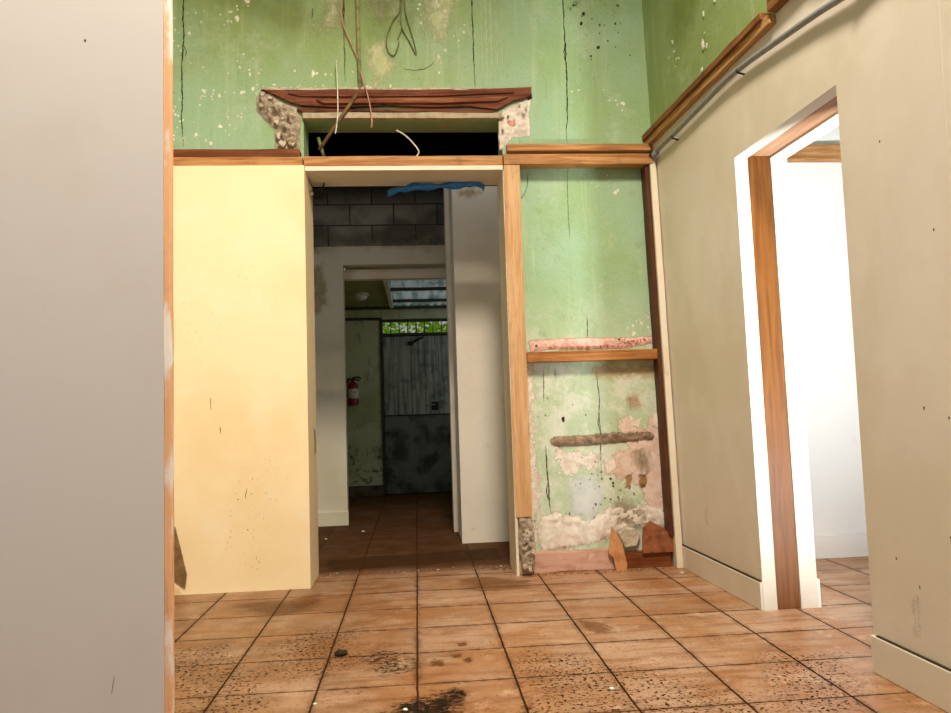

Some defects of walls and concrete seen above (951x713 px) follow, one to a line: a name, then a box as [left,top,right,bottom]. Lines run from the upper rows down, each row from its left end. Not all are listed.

crack [180,0,188,140]
spalling [198,50,301,149]
spalling [499,93,532,150]
peeling [518,315,664,575]
peeling [174,527,187,588]